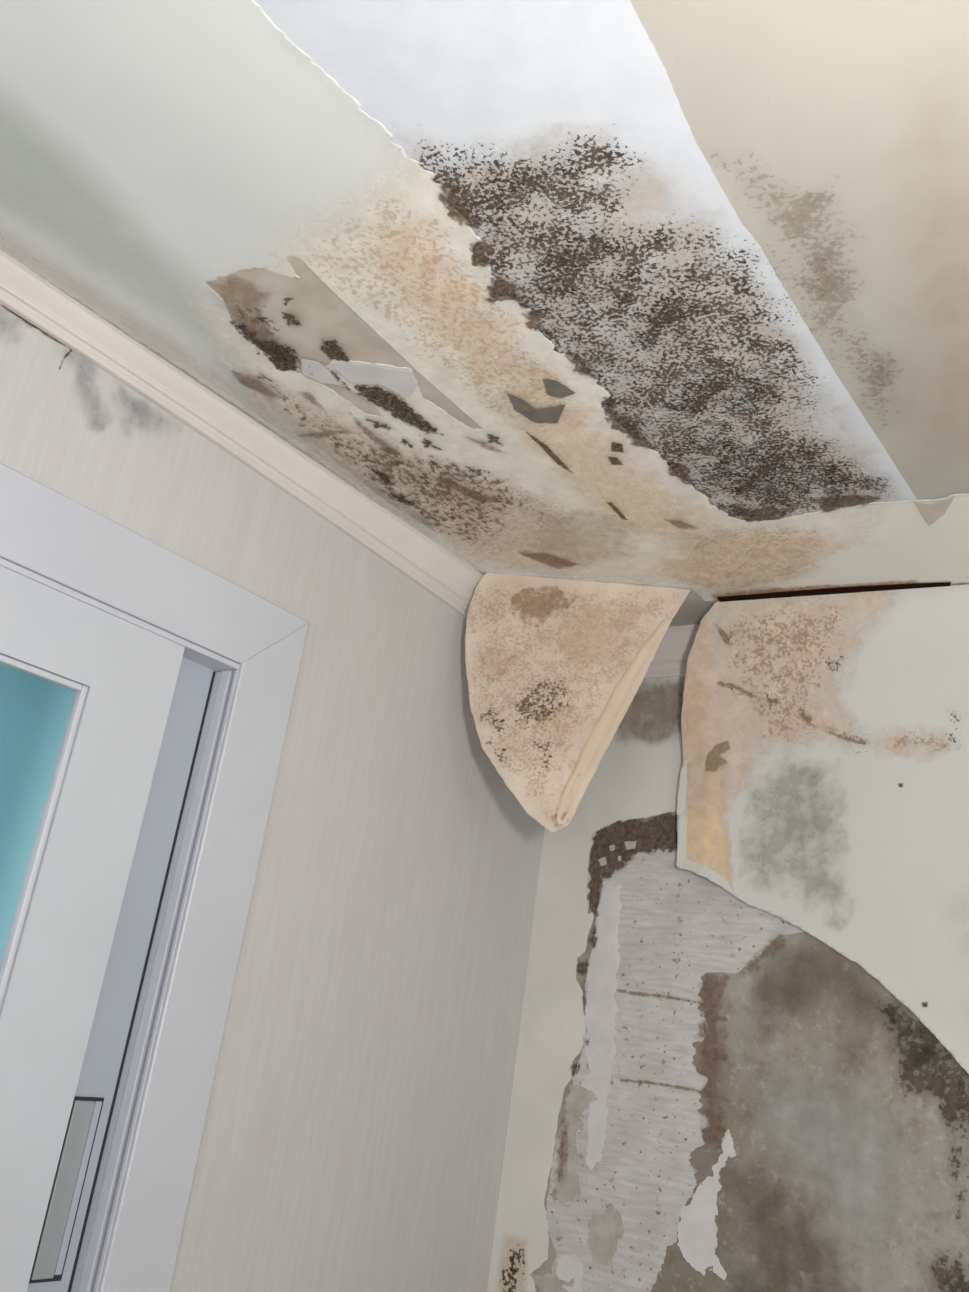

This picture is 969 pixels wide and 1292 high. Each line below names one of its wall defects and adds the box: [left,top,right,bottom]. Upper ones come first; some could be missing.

damp [214,124,894,915]
crack [715,581,965,602]
spalling [576,927,598,976]
damp [857,997,969,1219]
damp [771,1093,887,1243]
damp [502,1246,525,1292]
damp [931,1254,969,1292]